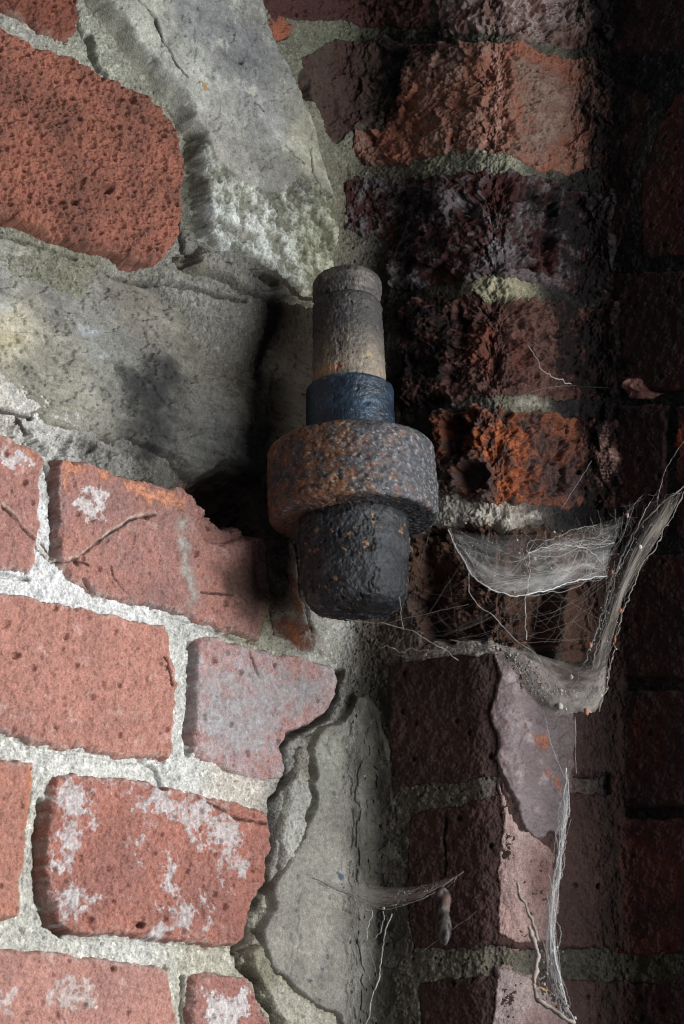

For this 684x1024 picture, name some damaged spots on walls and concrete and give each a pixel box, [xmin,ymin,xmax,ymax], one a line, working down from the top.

corrosion [279,576,314,650]
crack [279,707,329,746]
efflorescence [47,781,95,874]
efflorescence [131,783,247,877]
efflorescence [57,884,101,918]
efflorescence [139,896,214,945]
efflorescence [0,987,18,1015]
efflorescence [46,976,98,1010]
efflorescence [201,985,251,1024]